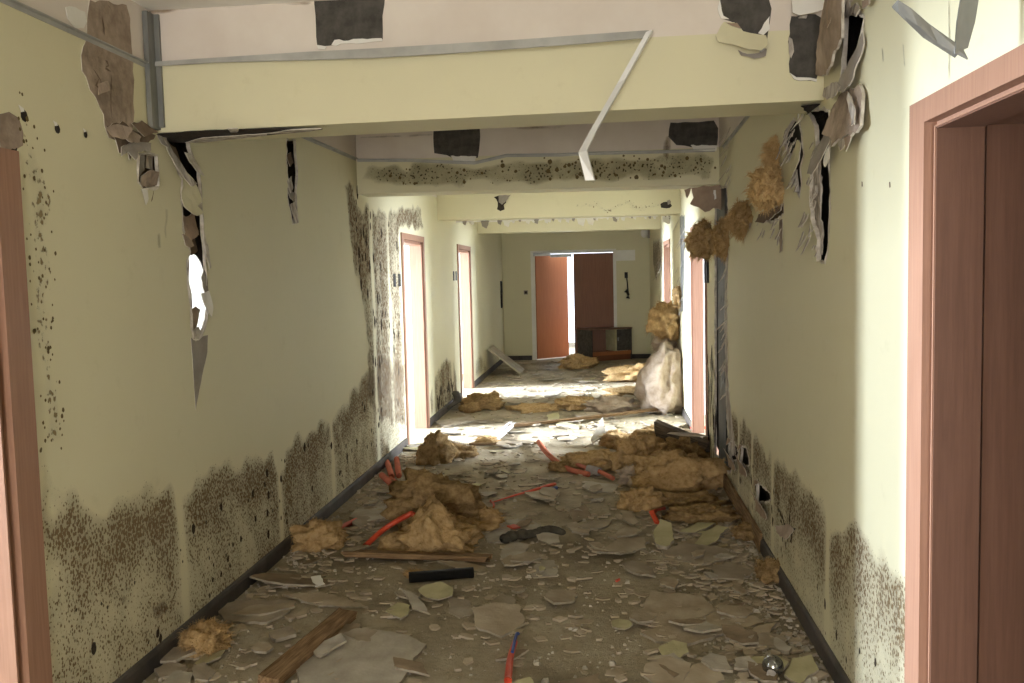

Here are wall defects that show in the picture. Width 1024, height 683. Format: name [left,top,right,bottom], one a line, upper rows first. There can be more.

mould [18,116,57,361]
peeling [81,0,198,205]
spalling [182,203,213,339]
mould [40,184,422,683]
water stain [371,141,716,185]
peeling [704,254,749,471]
peeling [770,209,783,253]
spalling [787,0,863,261]
mould [732,412,905,683]